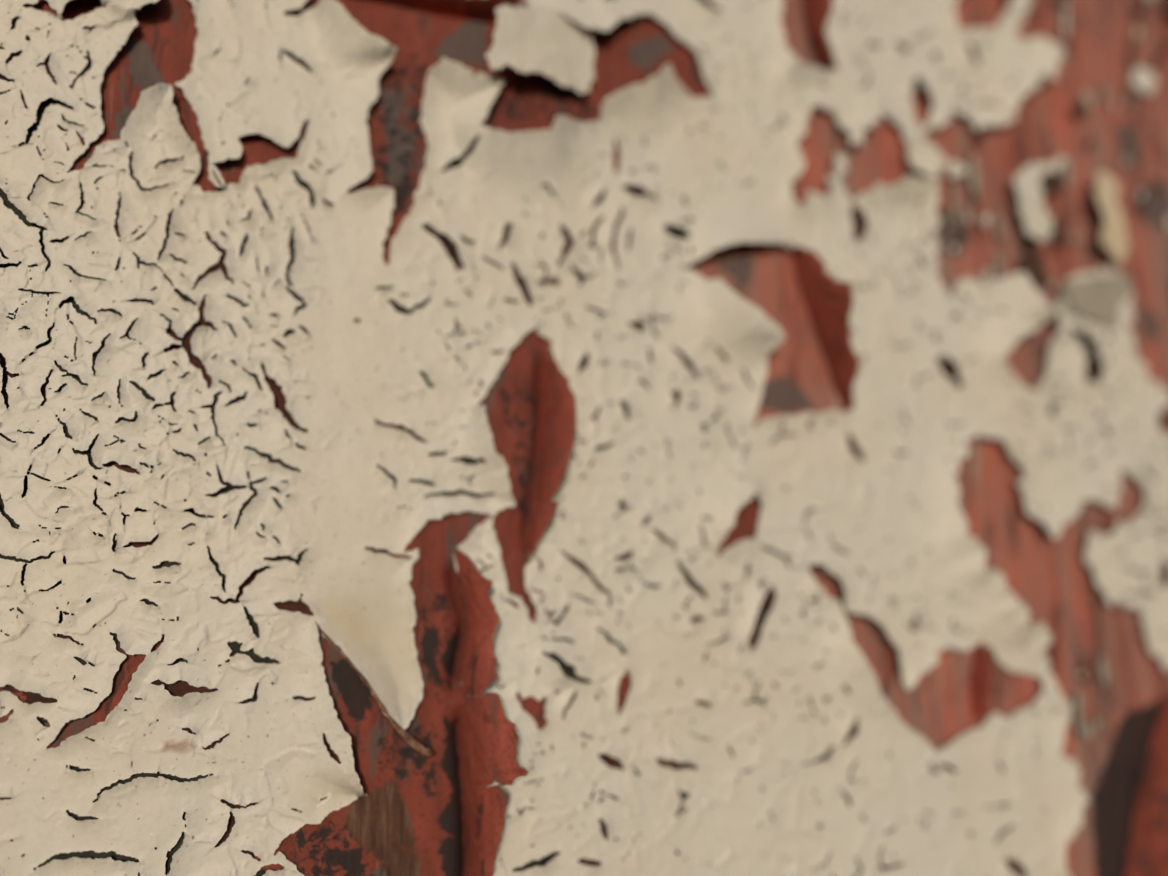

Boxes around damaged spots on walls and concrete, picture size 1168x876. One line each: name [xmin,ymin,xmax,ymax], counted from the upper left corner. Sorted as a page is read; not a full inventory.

peeling [0,0,731,281]
crack [435,128,486,176]
crack [370,180,665,318]
crack [0,12,349,670]
crack [369,411,506,503]
crack [622,316,704,413]
peeling [644,0,1168,876]
peeling [0,310,643,876]
crack [533,510,712,667]
crack [24,674,349,876]
crack [507,811,613,876]
crack [594,747,703,776]